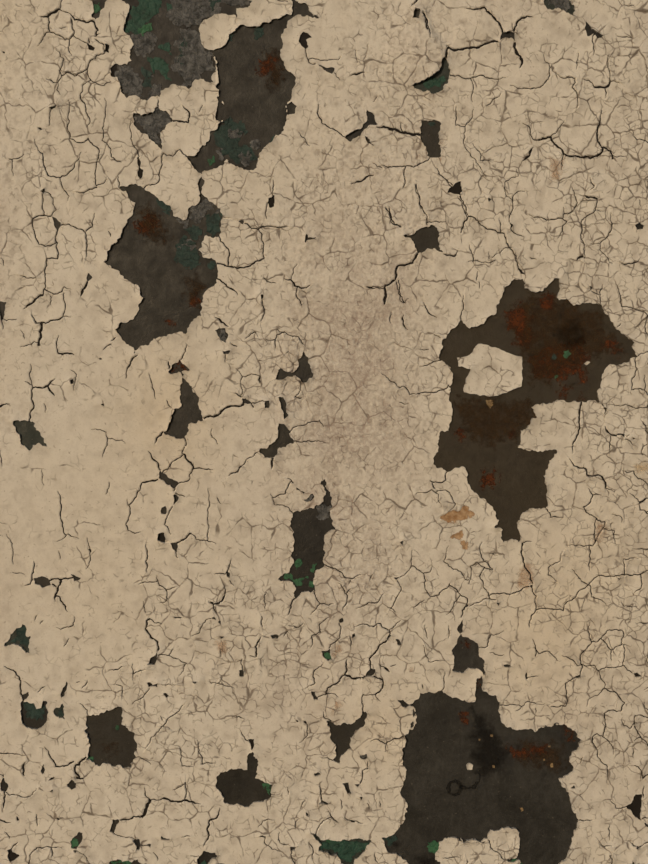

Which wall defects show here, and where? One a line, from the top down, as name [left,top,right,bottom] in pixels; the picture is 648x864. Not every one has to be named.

crack [2,0,140,420]
peeling [105,0,319,354]
crack [203,180,310,444]
peeling [433,278,637,542]
rust [504,292,591,400]
crack [0,748,90,864]
crack [6,471,91,646]
peeling [85,707,137,768]
crack [111,432,293,859]
peeling [216,739,272,807]
peeling [279,479,335,599]
peeling [382,620,581,864]